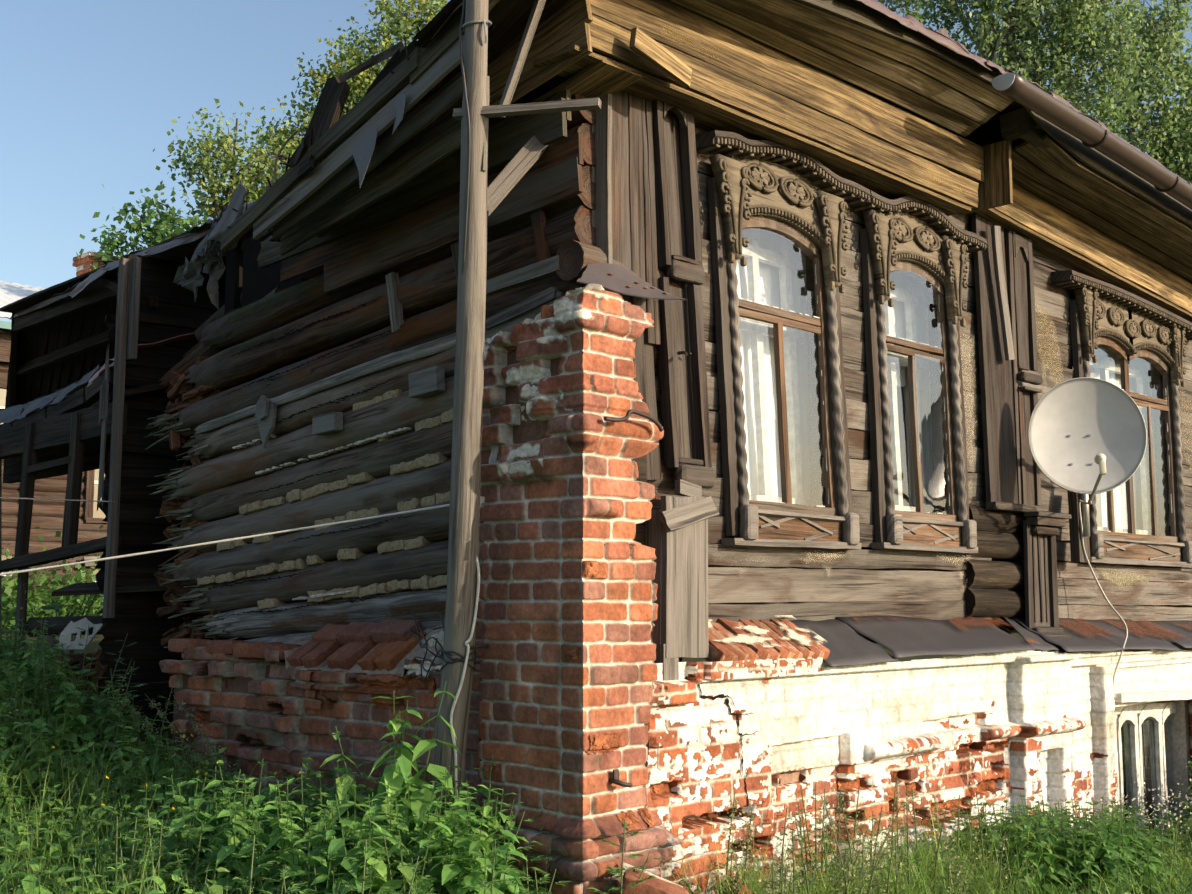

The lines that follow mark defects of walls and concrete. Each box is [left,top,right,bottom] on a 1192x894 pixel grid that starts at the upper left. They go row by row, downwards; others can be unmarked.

rust [1060,619,1192,637]
crack [698,683,761,807]
peeling [616,658,1086,894]
peeling [1062,752,1108,817]
peeling [1108,770,1118,816]